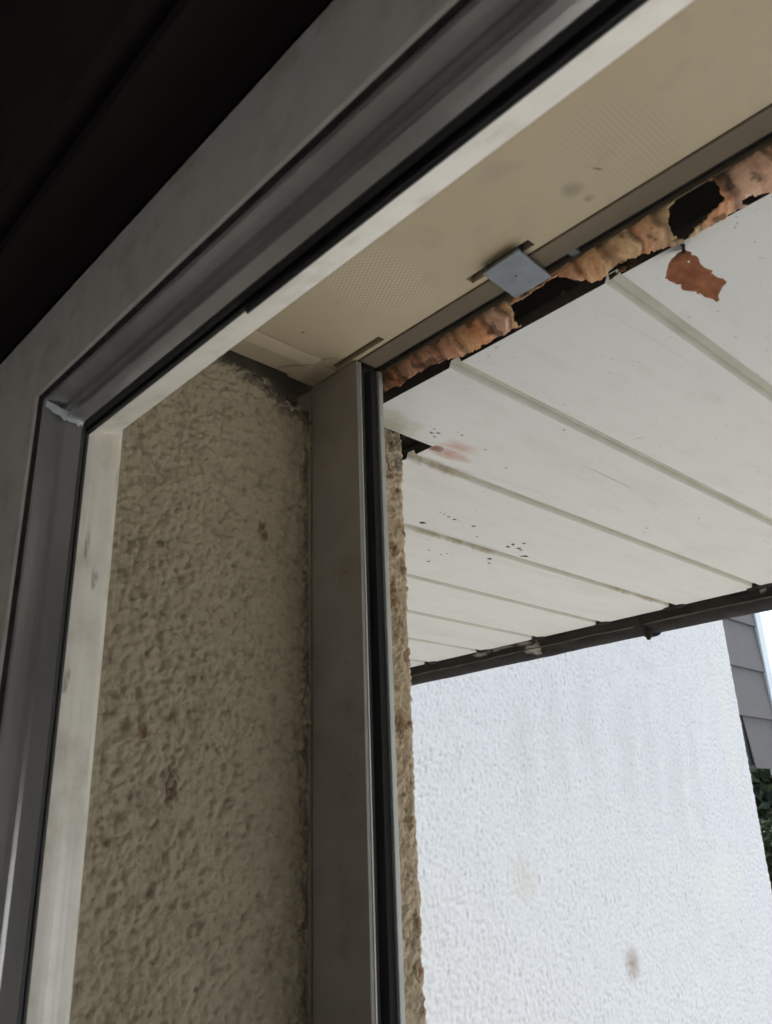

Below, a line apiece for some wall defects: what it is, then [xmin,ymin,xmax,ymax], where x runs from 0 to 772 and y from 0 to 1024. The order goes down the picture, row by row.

peeling [665,243,727,302]